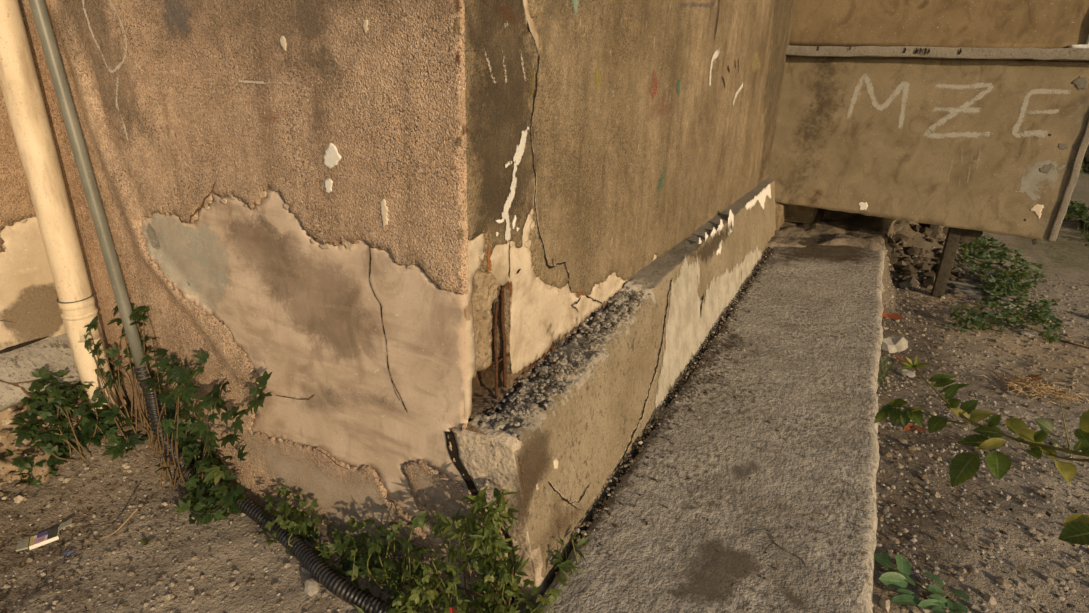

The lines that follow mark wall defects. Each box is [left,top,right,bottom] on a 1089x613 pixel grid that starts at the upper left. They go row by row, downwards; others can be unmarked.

crack [508,21,602,312]
peeling [1018,134,1080,221]
crack [0,379,40,397]
crack [0,320,48,354]
flaking render [0,217,66,350]
flaking render [141,189,629,590]
crack [369,247,408,413]
crack [614,279,672,472]
crack [444,431,515,602]
crack [549,481,590,510]